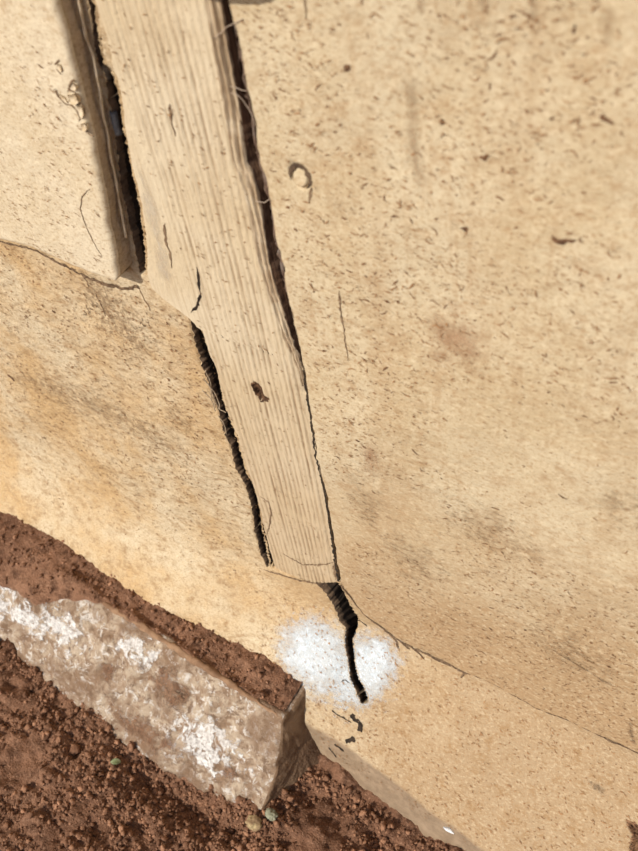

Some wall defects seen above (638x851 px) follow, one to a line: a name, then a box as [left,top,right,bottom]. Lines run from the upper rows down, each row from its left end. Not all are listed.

crack [190,0,638,757]